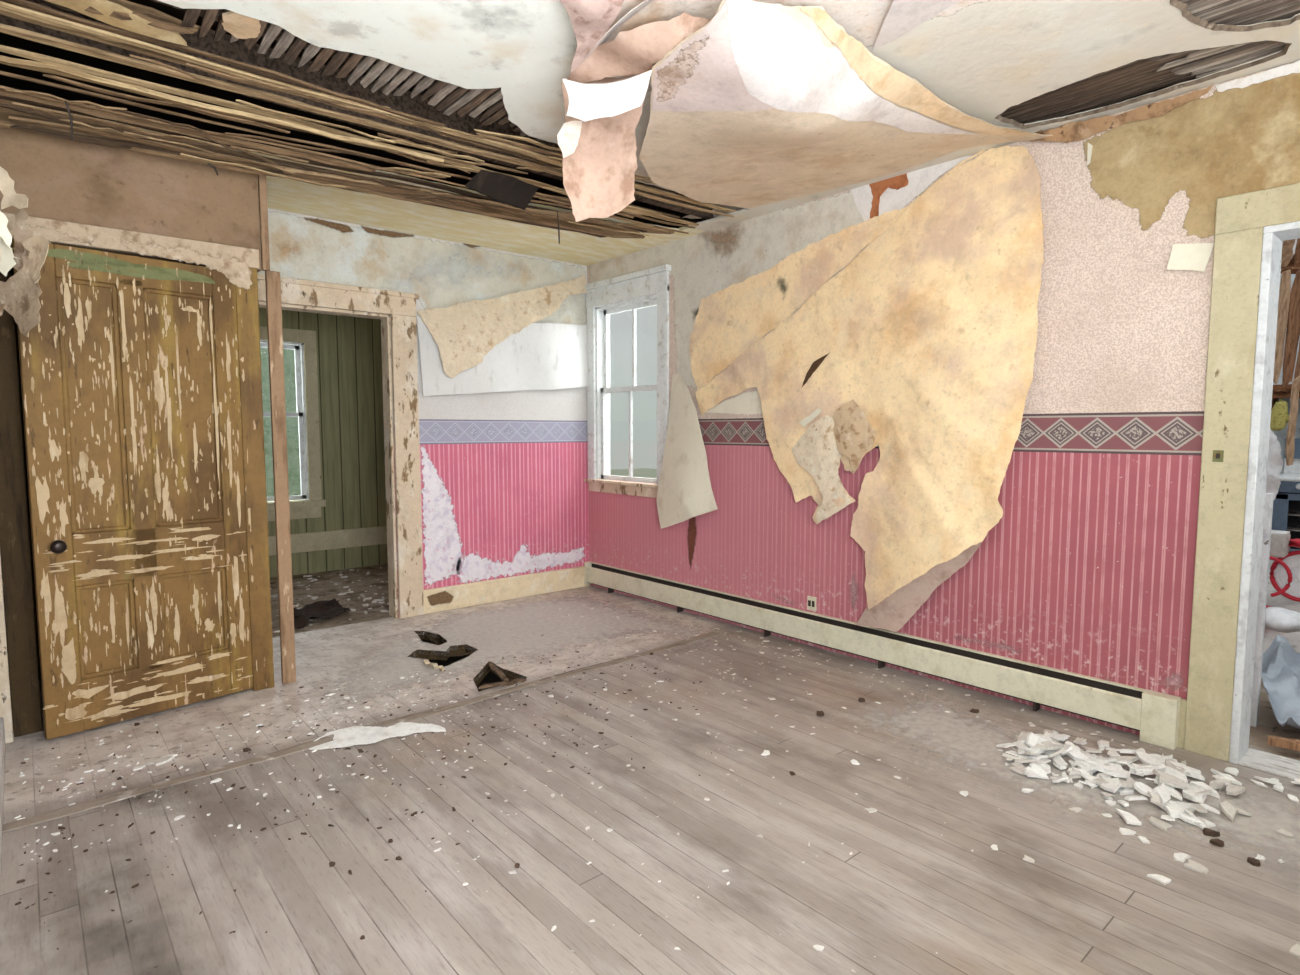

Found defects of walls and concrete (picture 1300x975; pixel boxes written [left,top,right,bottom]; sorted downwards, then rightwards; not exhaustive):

peeling [873,0,962,50]
spalling [995,0,1300,143]
peeling [305,218,414,238]
peeling [851,156,970,221]
peeling [22,224,257,726]
peeling [420,444,585,606]